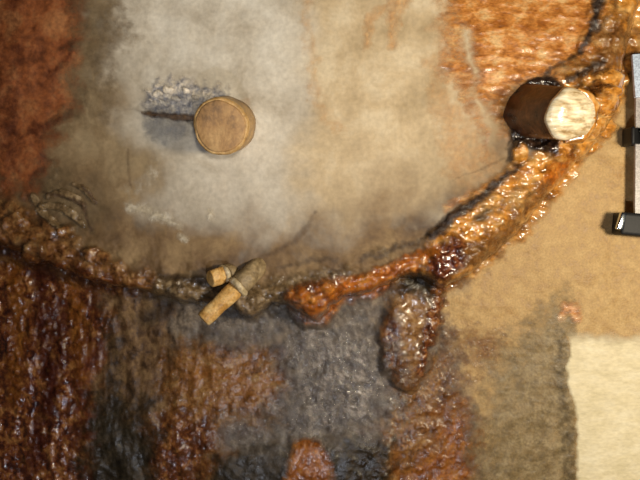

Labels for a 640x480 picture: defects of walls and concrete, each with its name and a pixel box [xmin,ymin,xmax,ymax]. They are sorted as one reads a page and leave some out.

corrosion [0,0,86,196]
spalling [143,77,226,120]
corrosion [439,0,608,130]
corrosion [563,88,601,144]
damp [0,198,224,306]
corrosion [328,251,433,297]
corrosion [0,241,140,480]
damp [73,396,163,480]
damp [195,270,406,480]
corrosion [284,439,332,480]
corrosion [361,354,482,480]
damp [479,305,640,480]